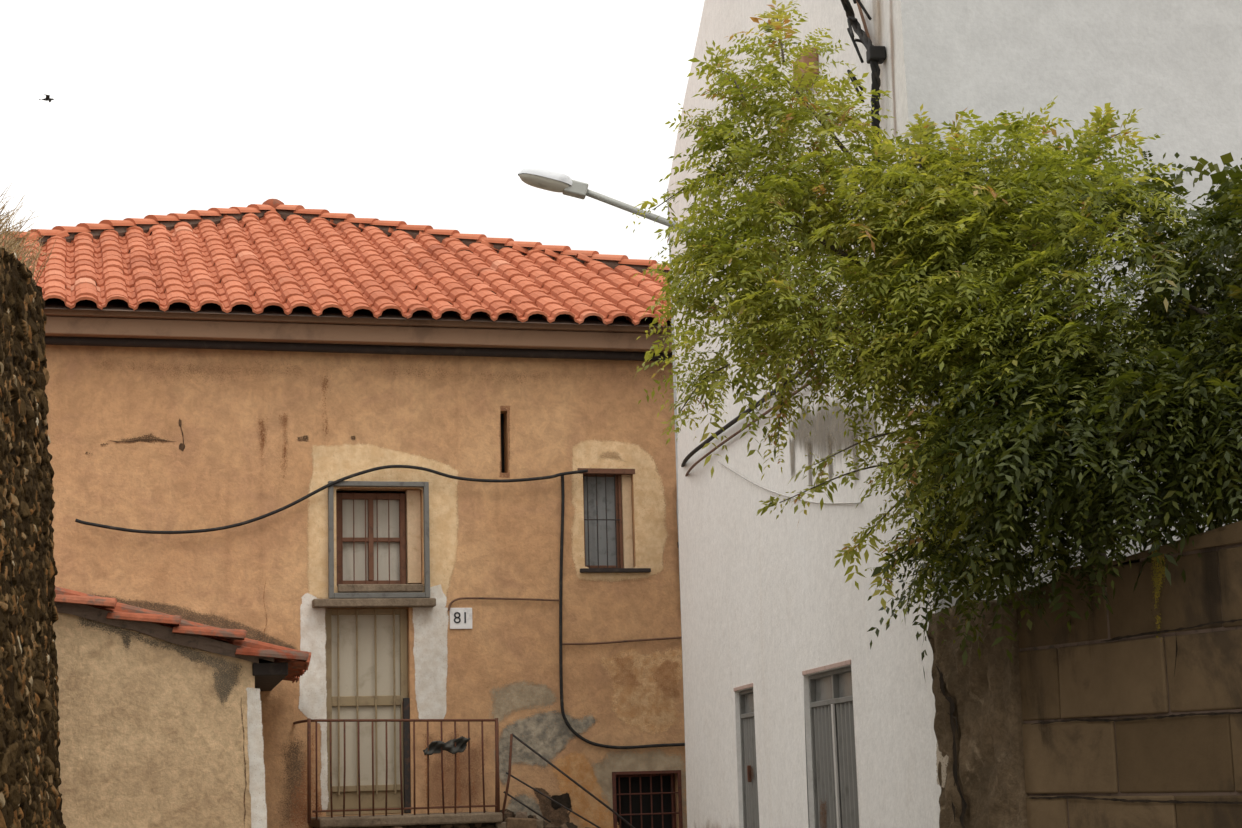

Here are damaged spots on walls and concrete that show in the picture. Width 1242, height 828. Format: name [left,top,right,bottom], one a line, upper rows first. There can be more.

leakage [77,617,246,703]
crack [935,664,967,828]